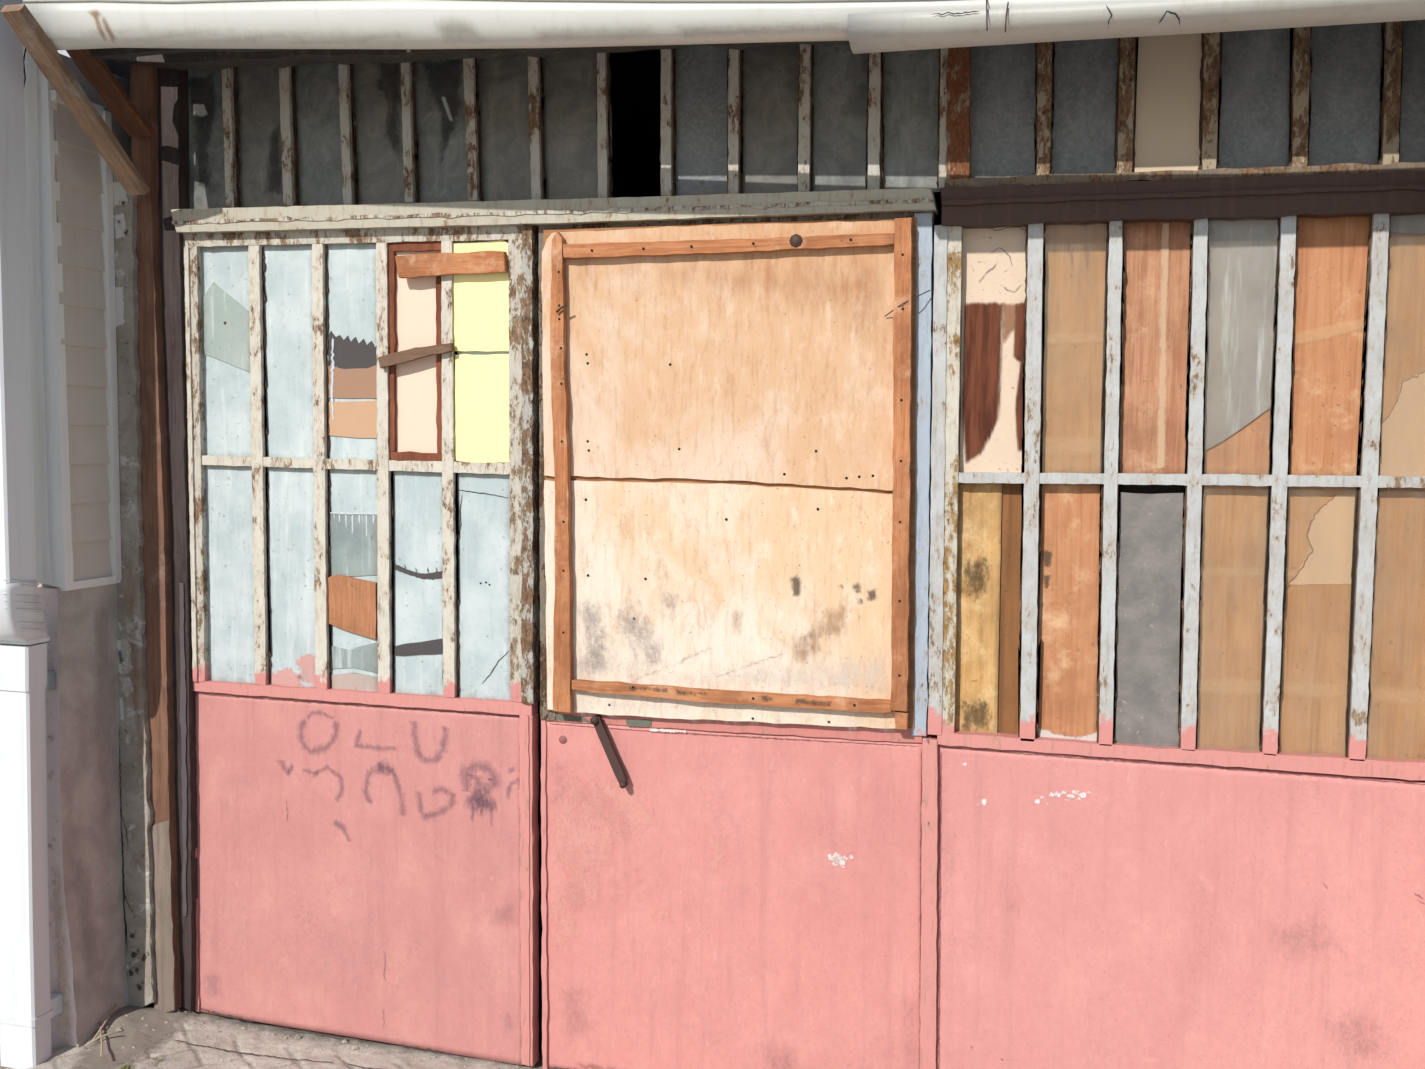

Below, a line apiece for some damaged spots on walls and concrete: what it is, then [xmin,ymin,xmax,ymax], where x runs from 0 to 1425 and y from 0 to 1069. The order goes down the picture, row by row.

peeling [1035,790,1090,805]
peeling [828,852,853,868]